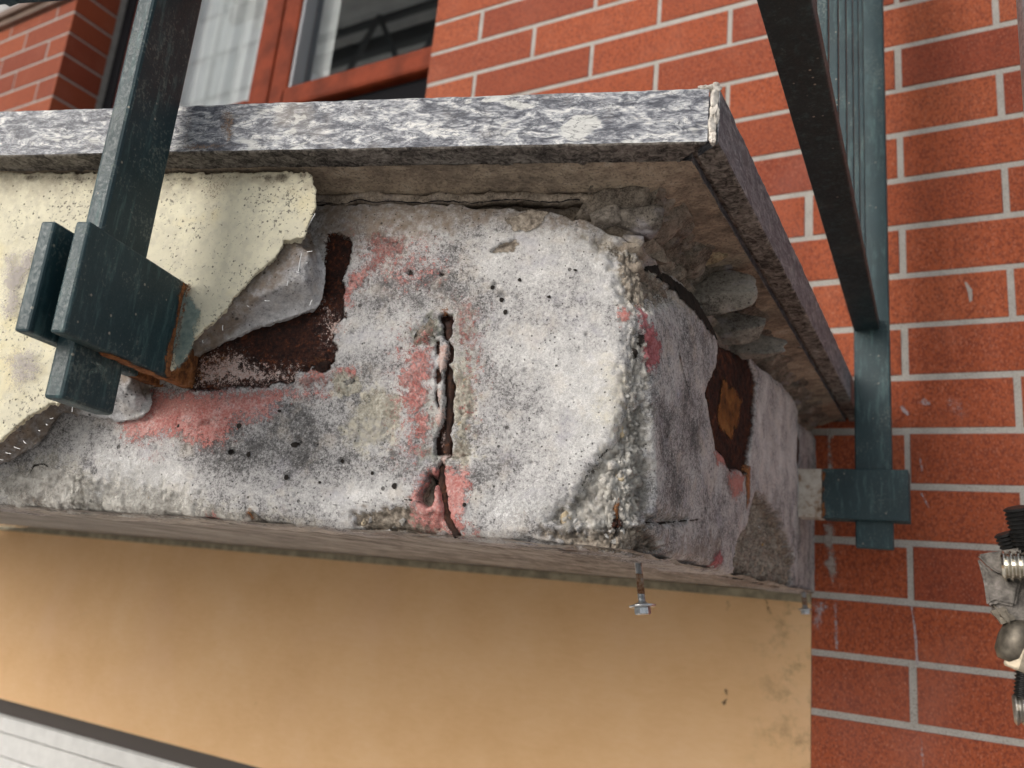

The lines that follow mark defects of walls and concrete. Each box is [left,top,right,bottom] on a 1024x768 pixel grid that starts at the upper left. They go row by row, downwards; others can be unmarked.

crack [316,198,580,206]
rust [191,232,352,393]
crack [644,265,717,340]
crack [404,309,461,538]
rust [705,342,757,506]